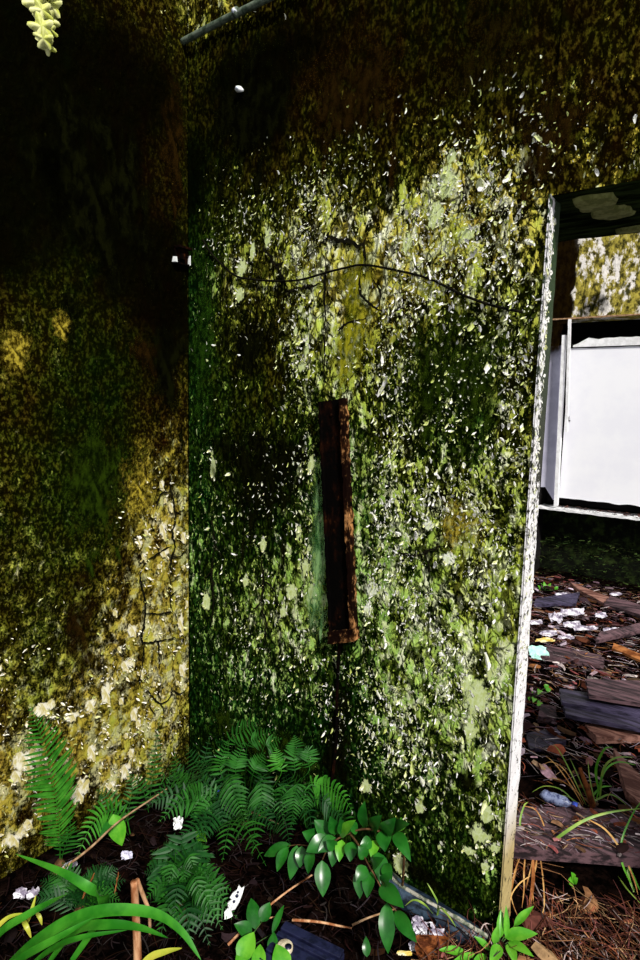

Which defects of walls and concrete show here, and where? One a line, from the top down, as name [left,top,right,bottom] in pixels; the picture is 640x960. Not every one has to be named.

crack [122,458,187,722]